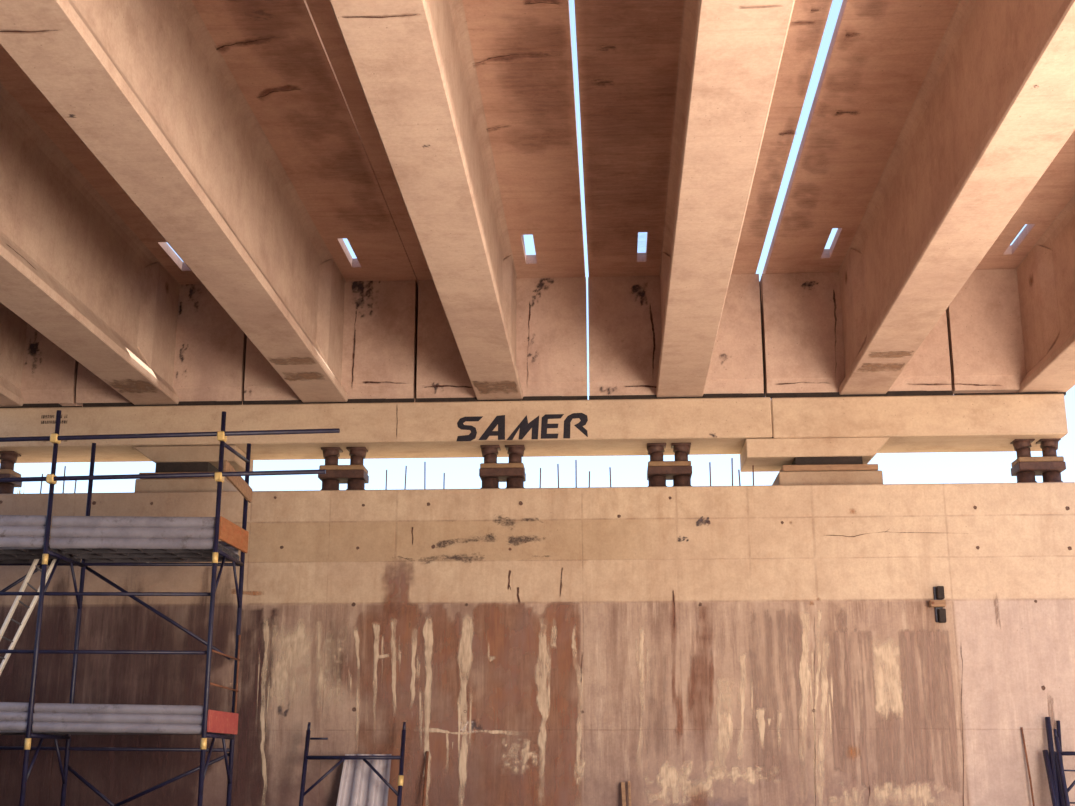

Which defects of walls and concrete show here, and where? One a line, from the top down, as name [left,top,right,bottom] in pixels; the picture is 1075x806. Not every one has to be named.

crack [352,312,398,437]
crack [429,382,471,390]
crack [625,305,657,388]
damp [0,565,585,806]
rust [672,659,713,735]
damp [656,611,958,806]